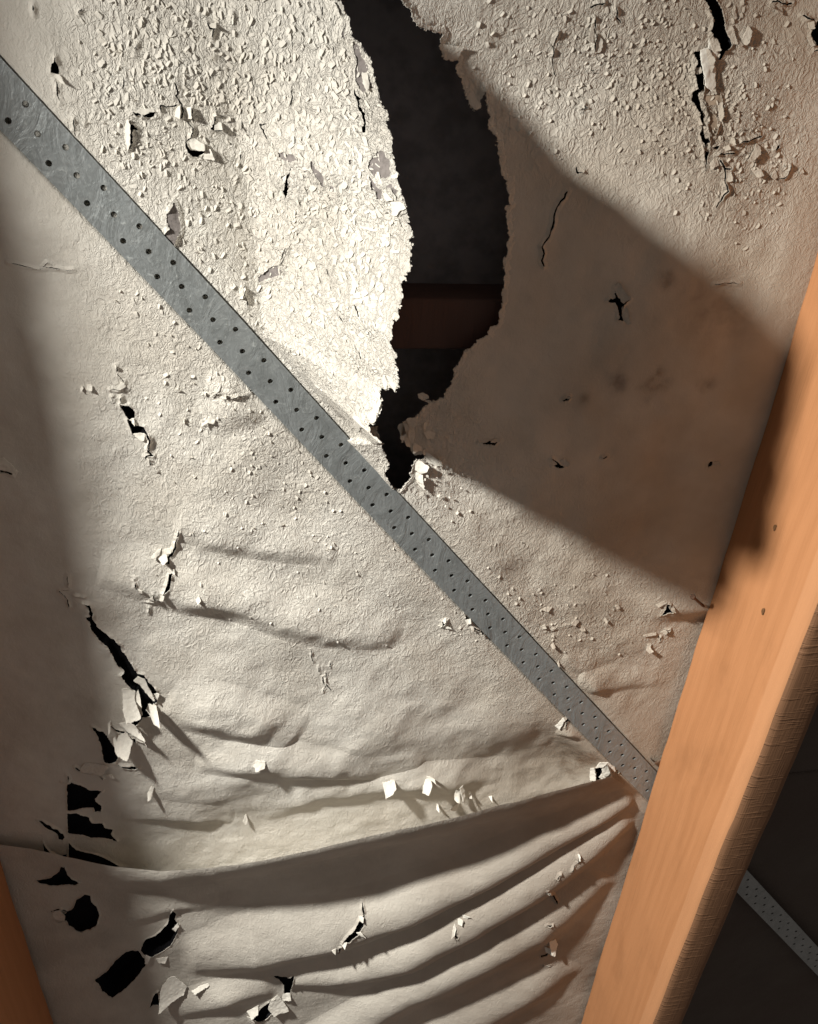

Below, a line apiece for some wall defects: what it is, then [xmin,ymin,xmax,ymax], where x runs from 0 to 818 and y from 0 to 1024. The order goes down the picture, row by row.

peeling [442,44,464,60]
peeling [469,96,481,110]
crack [686,0,753,212]
peeling [78,0,411,431]
crack [537,186,572,271]
peeling [178,408,218,443]
peeling [189,372,319,527]
peeling [397,417,469,496]
peeling [108,676,160,761]
peeling [251,760,265,772]
peeling [539,939,558,968]